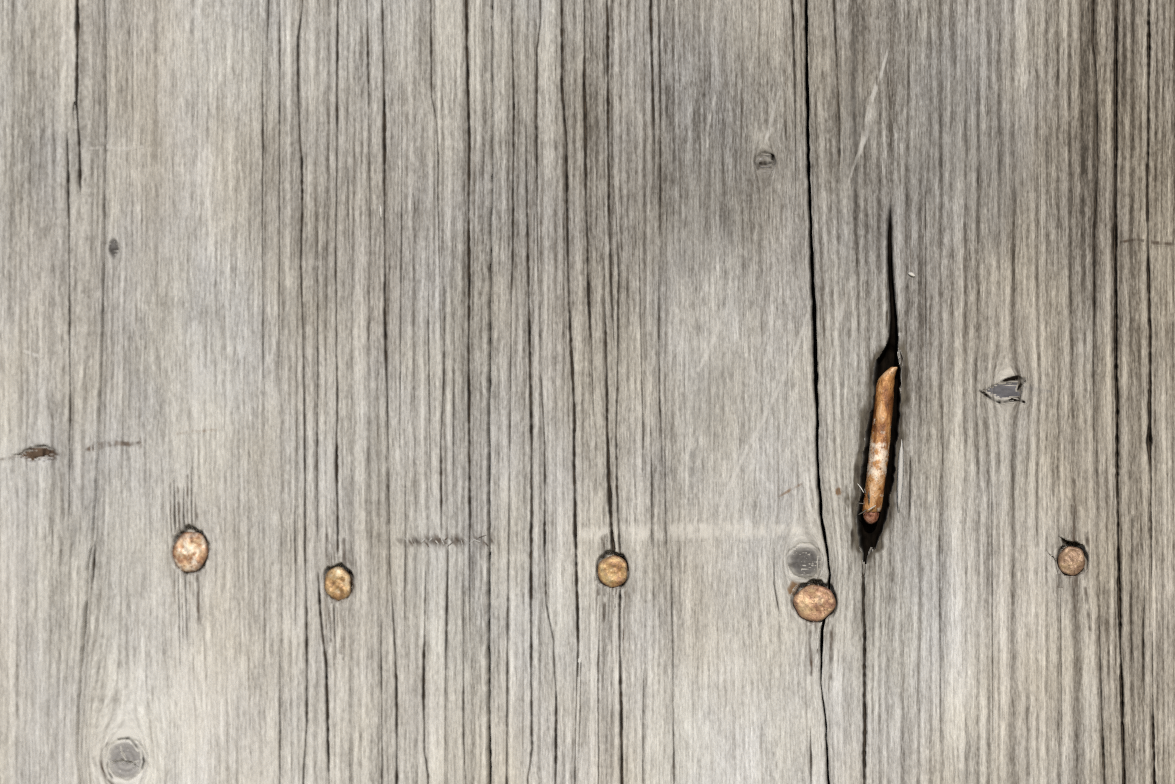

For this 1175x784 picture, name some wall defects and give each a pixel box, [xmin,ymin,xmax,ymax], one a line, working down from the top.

crack [64,0,97,585]
crack [259,0,473,784]
crack [503,0,677,784]
crack [1089,0,1175,784]
corrosion [159,472,215,647]
corrosion [314,531,363,663]
corrosion [583,532,640,654]
corrosion [783,552,844,682]
crack [1045,534,1085,745]
corrosion [1047,476,1094,654]
crack [806,721,814,784]